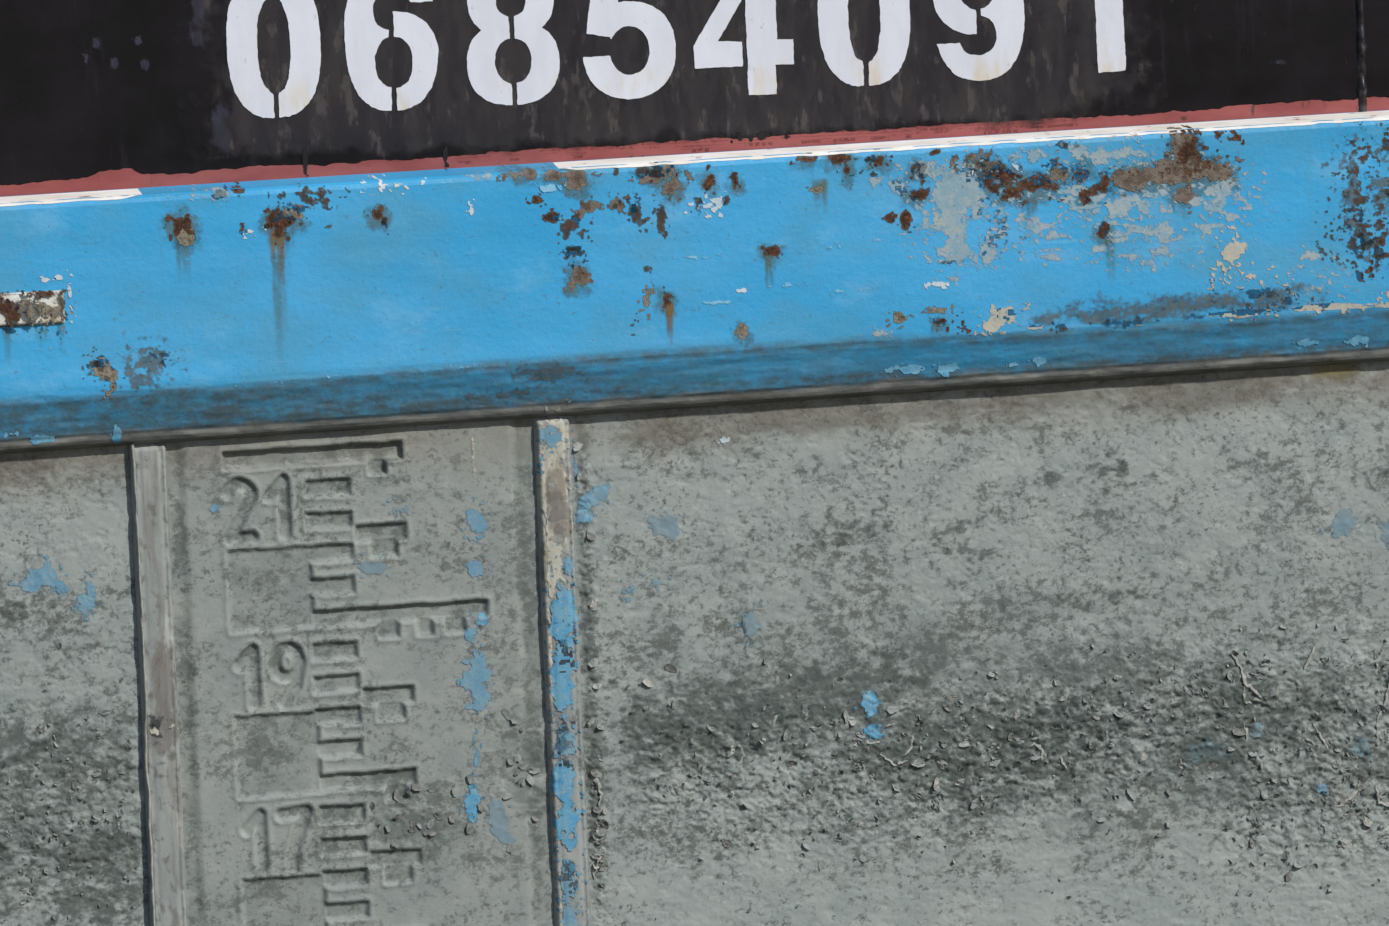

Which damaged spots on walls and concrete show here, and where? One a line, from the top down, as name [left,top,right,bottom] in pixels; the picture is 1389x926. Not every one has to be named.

corrosion [0,288,74,335]
corrosion [164,210,198,247]
corrosion [243,174,427,259]
corrosion [496,155,743,297]
corrosion [631,266,675,335]
corrosion [759,244,783,272]
corrosion [789,149,893,194]
corrosion [882,116,1245,233]
peeling [860,135,1389,337]
corrosion [1290,121,1389,305]
peeling [370,399,611,926]
peeling [644,624,1389,892]